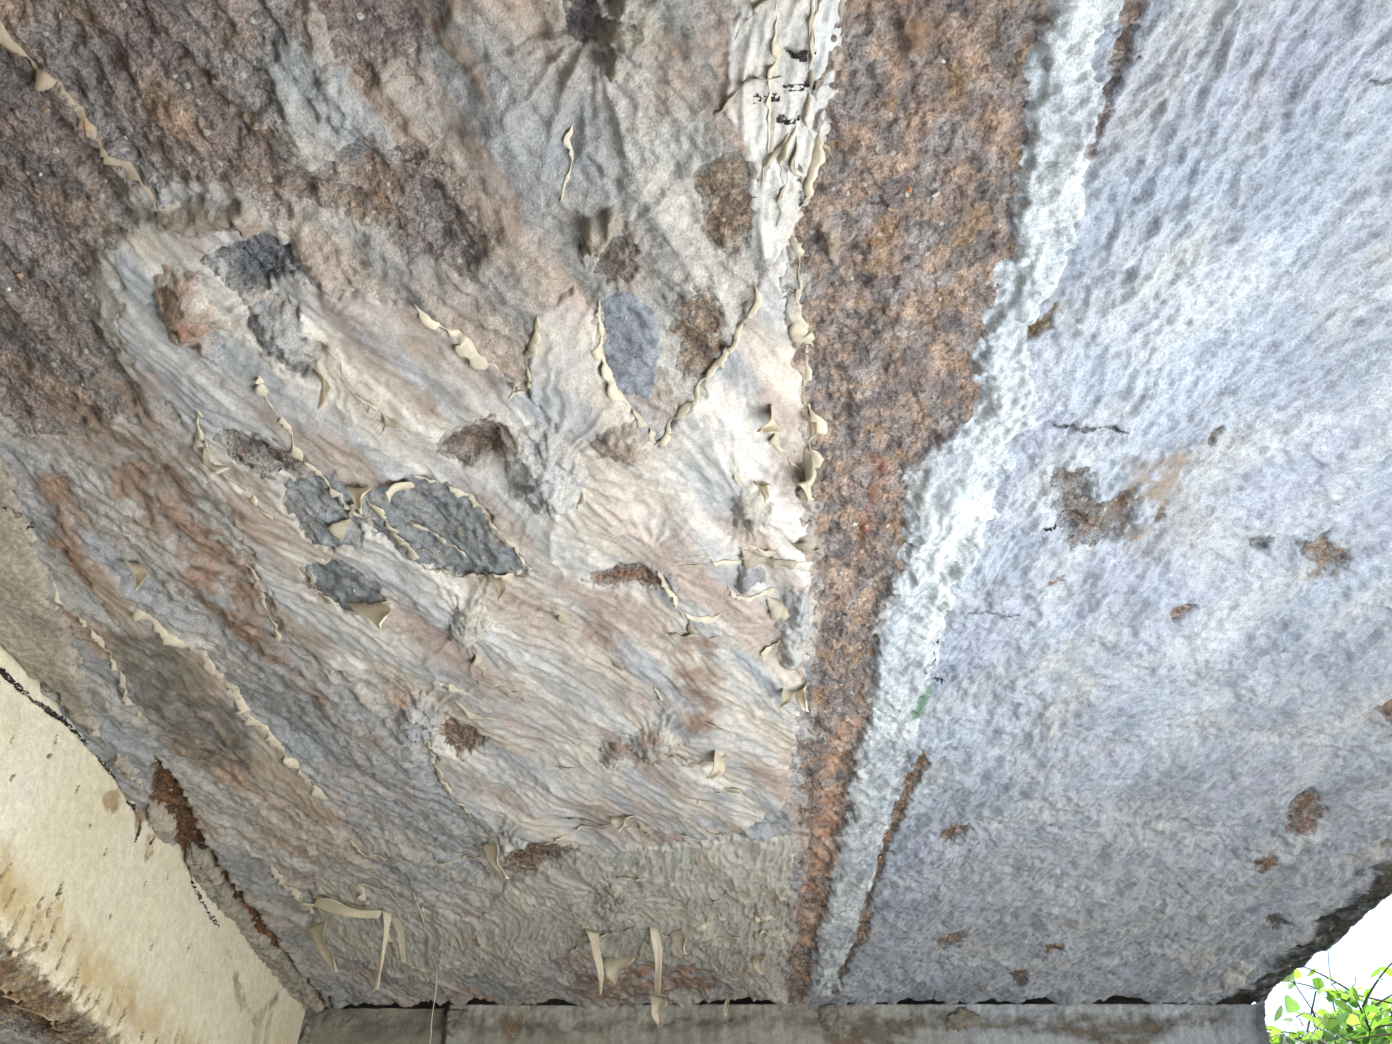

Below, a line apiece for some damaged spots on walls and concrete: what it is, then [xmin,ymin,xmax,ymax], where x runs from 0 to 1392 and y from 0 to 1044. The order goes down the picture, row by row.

peeling [0,0,1056,1044]
spalling [1048,465,1143,550]
rust [828,718,858,773]
spalling [1372,700,1392,723]
crack [0,667,224,928]
spalling [1284,786,1330,837]
rust [801,791,838,946]
spalling [1250,851,1279,874]